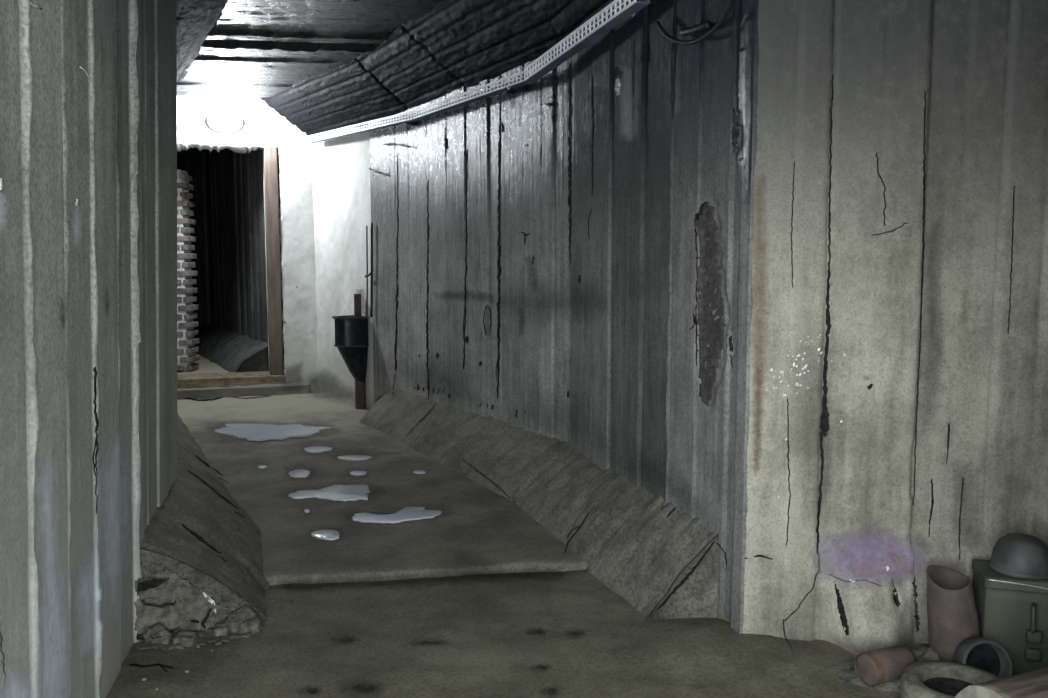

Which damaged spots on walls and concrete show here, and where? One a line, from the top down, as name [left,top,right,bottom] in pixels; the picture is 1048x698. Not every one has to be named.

crack [872,152,908,236]
spalling [689,202,734,406]
crack [783,74,834,650]
crack [91,367,99,514]
crack [461,458,516,503]
crack [564,512,590,554]
spalling [134,569,263,650]